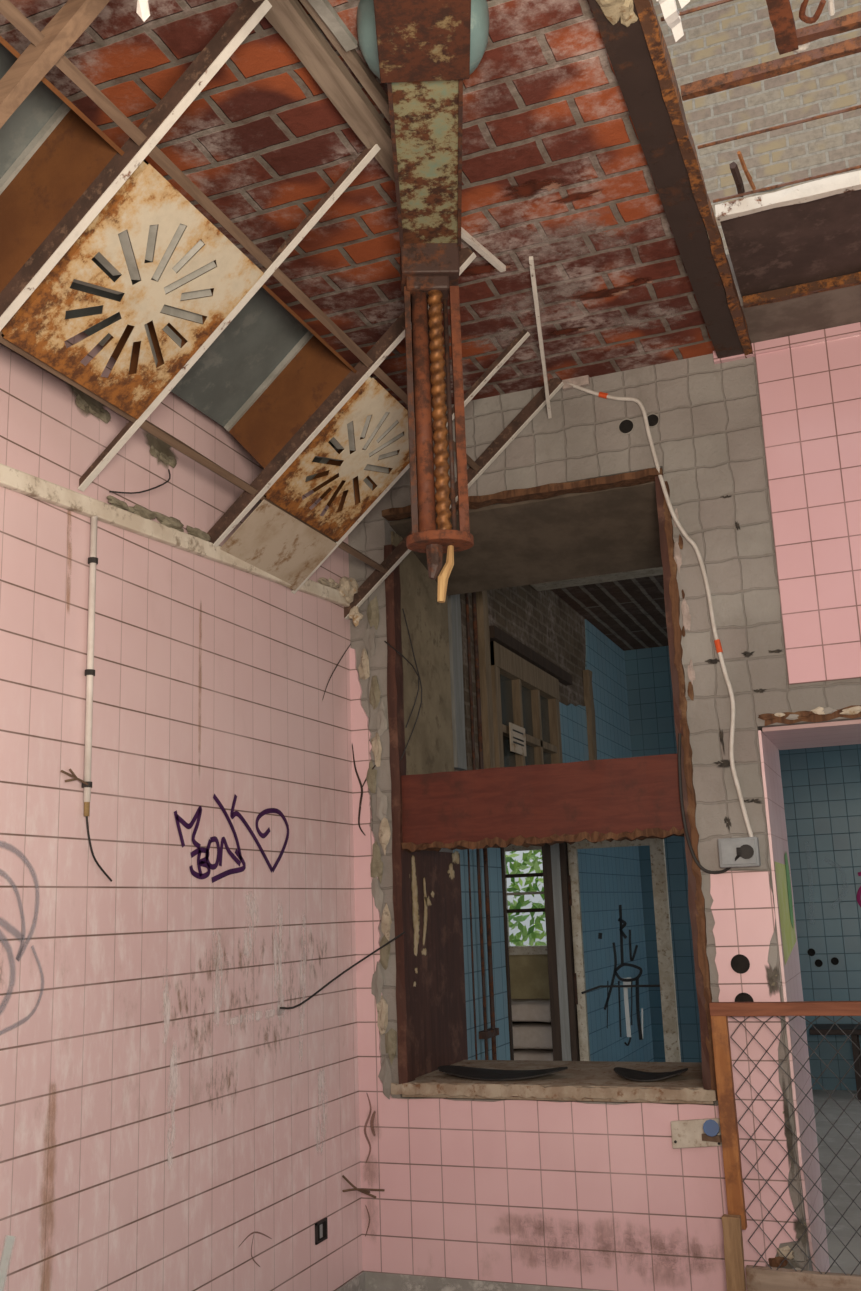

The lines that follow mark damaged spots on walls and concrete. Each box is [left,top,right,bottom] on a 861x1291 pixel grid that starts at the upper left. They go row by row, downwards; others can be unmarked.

peeling [596,0,638,27]
flaking render [358,596,397,1100]